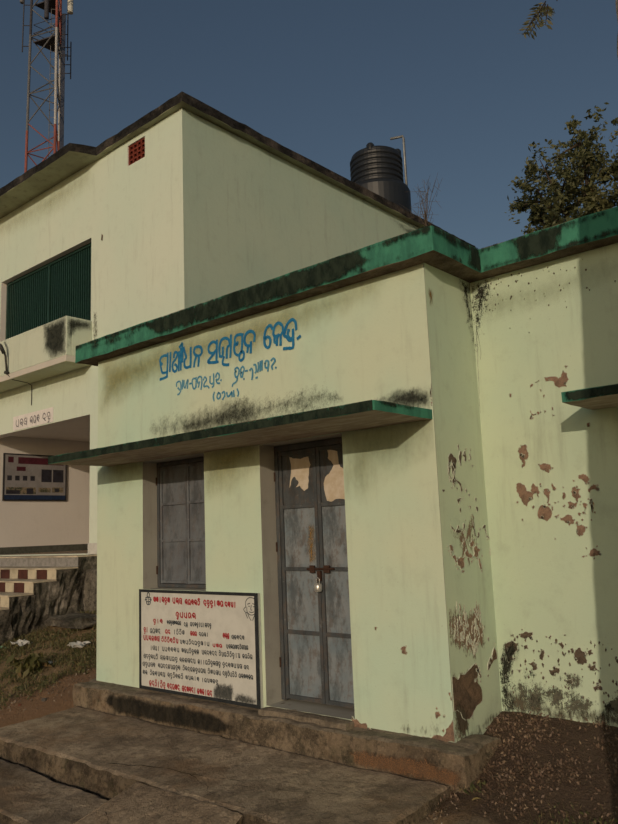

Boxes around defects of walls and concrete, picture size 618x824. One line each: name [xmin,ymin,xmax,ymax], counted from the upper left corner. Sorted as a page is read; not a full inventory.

water stain [382,211,618,271]
water stain [45,247,370,356]
water stain [459,279,490,345]
peeling [530,365,569,397]
water stain [48,391,428,464]
peeling [517,444,529,468]
peeling [442,444,491,573]
peeling [516,473,600,537]
flaking render [421,599,618,742]
water stain [499,642,593,717]
water stain [595,690,618,722]